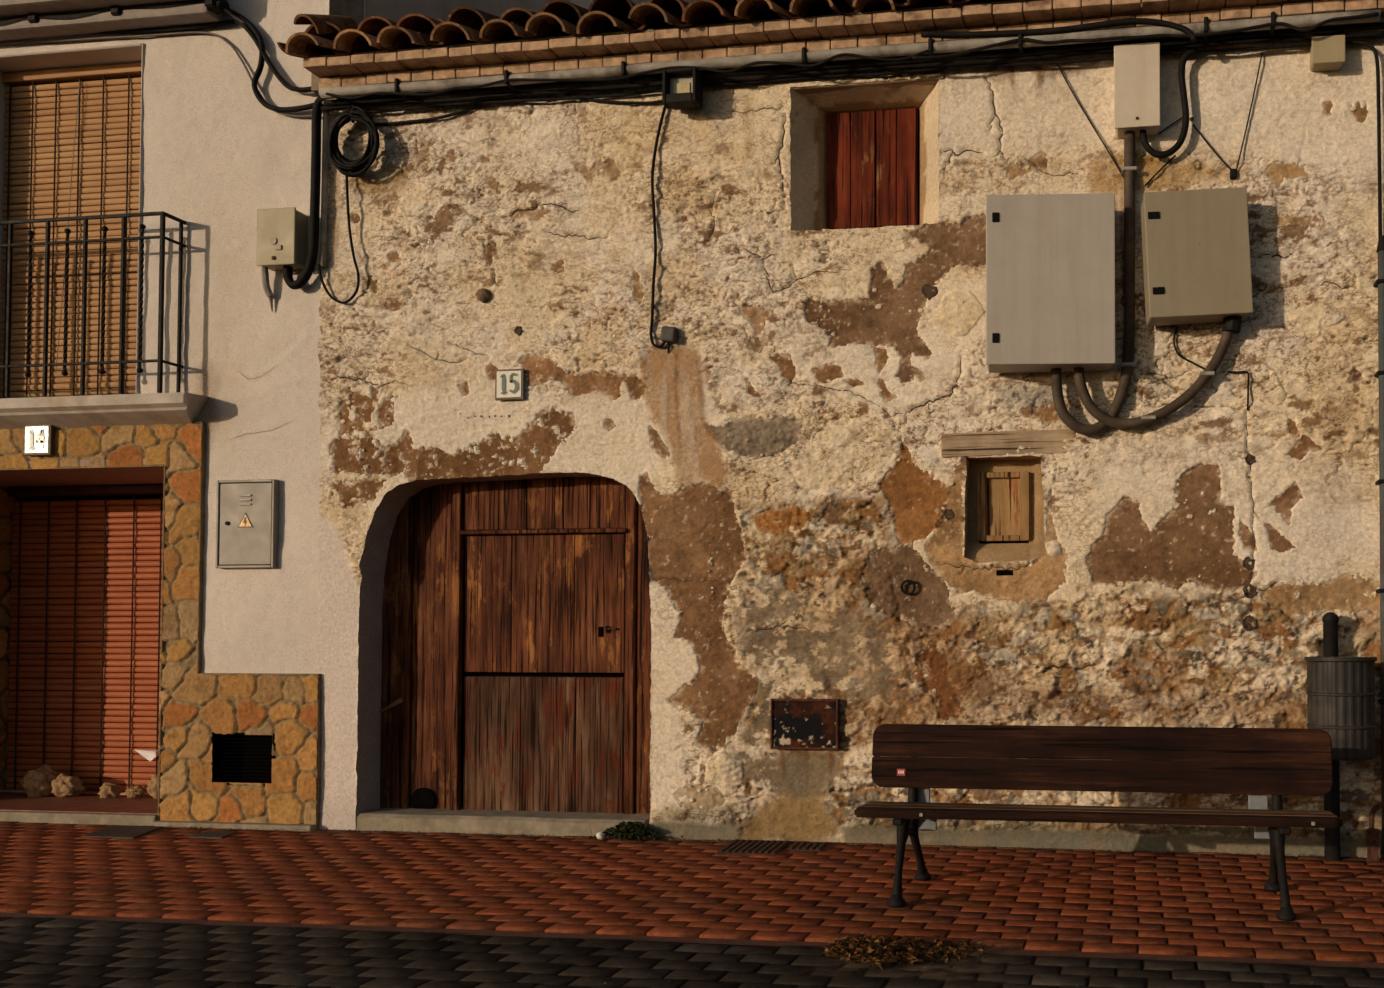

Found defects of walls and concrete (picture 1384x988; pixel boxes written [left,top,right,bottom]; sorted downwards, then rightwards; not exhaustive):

flaking render [741,214,986,403]
flaking render [330,354,648,509]
flaking render [1286,416,1322,460]
flaking render [639,473,854,752]
flaking render [861,444,1068,629]
flaking render [1086,463,1380,617]
spalling [1242,615,1258,631]